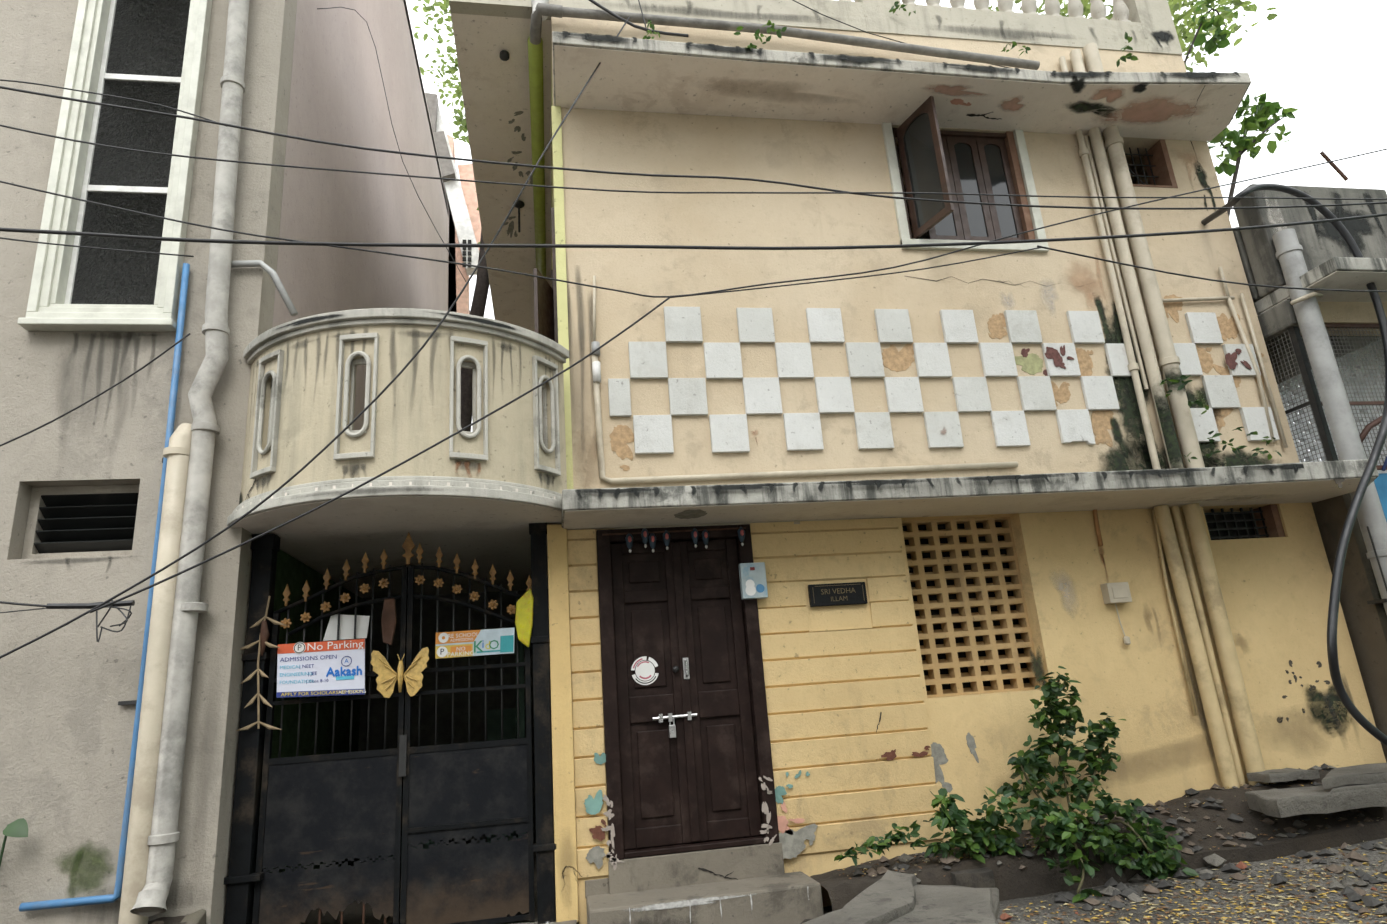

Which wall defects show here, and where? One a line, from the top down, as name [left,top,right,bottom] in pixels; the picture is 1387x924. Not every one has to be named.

peeling [935,86,979,106]
peeling [1094,89,1191,122]
leakage [440,313,516,352]
peeling [987,313,1007,339]
peeling [1014,345,1093,407]
leakage [1306,685,1351,734]
peeling [594,753,606,765]
peeling [584,790,624,870]
peeling [759,770,818,859]